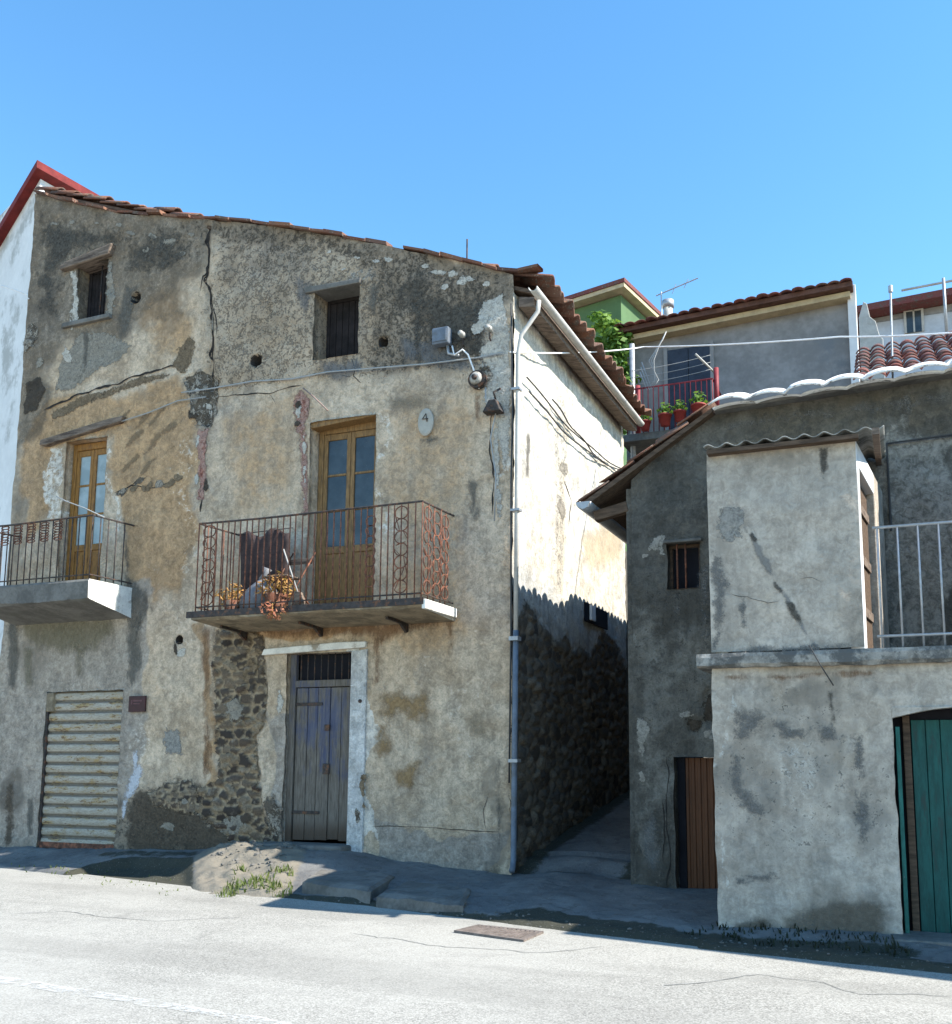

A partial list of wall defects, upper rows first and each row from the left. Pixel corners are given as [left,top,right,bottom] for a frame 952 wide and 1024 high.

peeling [105,261,115,314]
peeling [421,264,490,290]
crack [200,229,303,454]
peeling [23,270,219,500]
peeling [471,293,511,518]
spalling [293,390,310,516]
spalling [125,628,284,850]
damp [384,693,427,721]
damp [396,762,418,787]
damp [731,759,763,815]
damp [775,722,803,738]
damp [854,737,864,776]